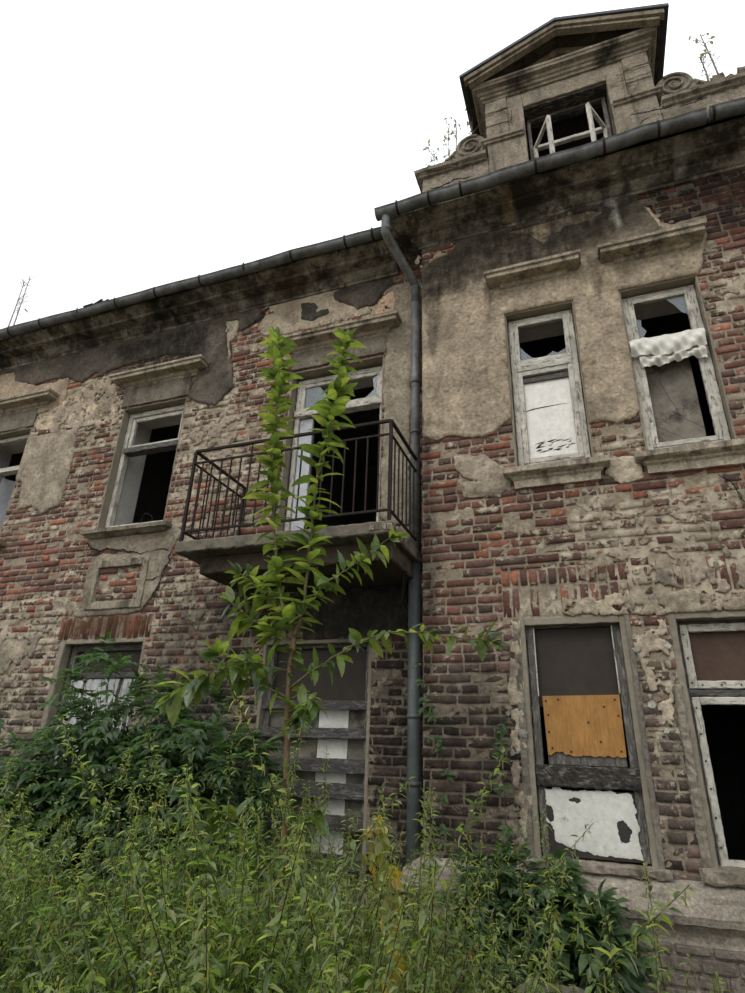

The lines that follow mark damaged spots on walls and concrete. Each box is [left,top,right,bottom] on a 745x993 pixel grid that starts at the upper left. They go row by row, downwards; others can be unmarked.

leakage [424,199,632,293]
peeling [644,206,707,229]
peeling [225,320,239,360]
peeling [253,290,399,336]
peeling [33,374,119,431]
spalling [535,438,575,453]
crack [87,543,173,609]
spalling [0,641,30,660]
peeling [630,620,675,733]
peeling [506,620,533,839]